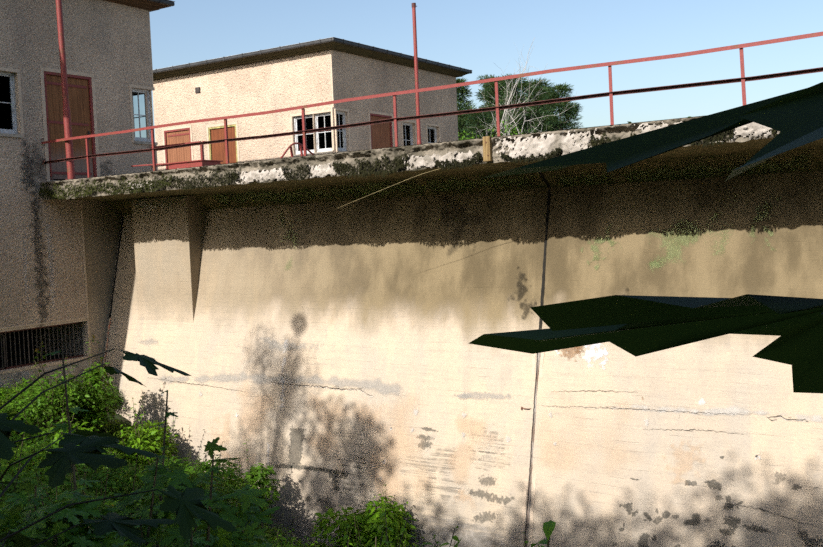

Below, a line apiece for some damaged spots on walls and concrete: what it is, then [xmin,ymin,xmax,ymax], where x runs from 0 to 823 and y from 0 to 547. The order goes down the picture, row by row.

water stain [22,141,50,326]
water stain [275,425,348,513]
water stain [389,512,512,547]
water stain [637,533,657,547]
water stain [621,503,701,525]
water stain [685,480,770,547]
water stain [797,526,823,547]